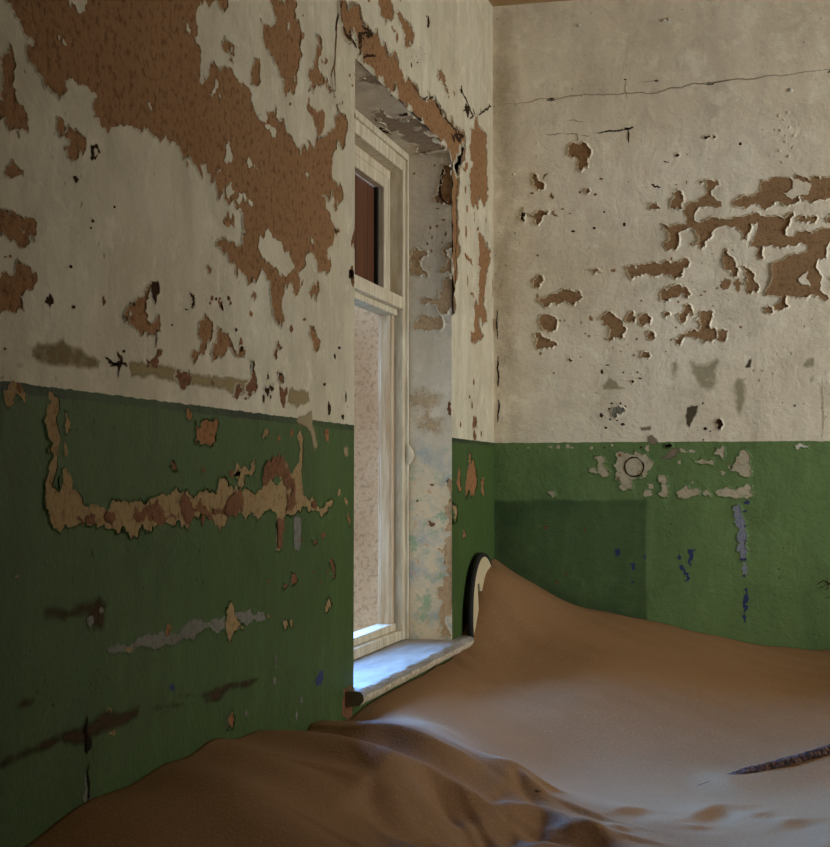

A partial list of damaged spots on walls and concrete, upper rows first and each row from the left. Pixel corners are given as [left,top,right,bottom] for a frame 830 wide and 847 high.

peeling [0,0,355,410]
flaking render [337,0,494,346]
peeling [530,172,554,199]
peeling [519,208,572,227]
peeling [531,273,585,355]
peeling [566,140,593,173]
crack [412,69,830,214]
peeling [580,173,830,360]
peeling [42,389,351,554]
peeling [587,442,756,577]
peeling [714,417,725,431]
peeling [225,600,245,643]